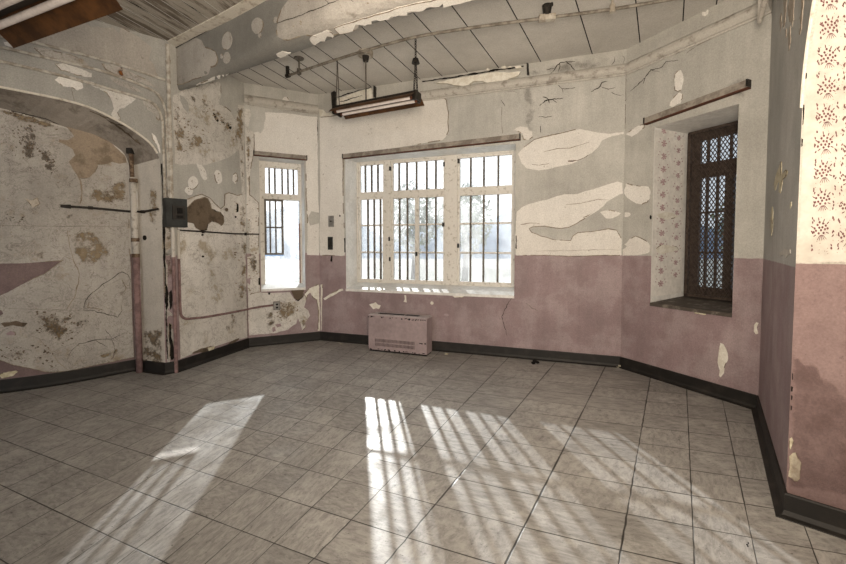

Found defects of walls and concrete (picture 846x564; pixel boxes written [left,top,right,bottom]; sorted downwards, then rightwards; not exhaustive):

peeling [36,23,158,76]
peeling [251,0,472,45]
peeling [779,0,804,51]
peeling [55,63,135,121]
crack [539,38,712,132]
peeling [515,124,645,170]
peeling [0,110,134,379]
peeling [162,32,449,362]
peeling [515,182,651,257]
crack [40,226,131,370]
peeling [718,343,728,377]
peeling [788,437,802,482]